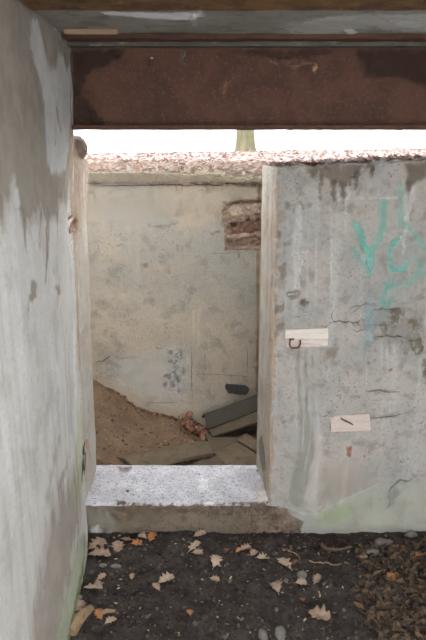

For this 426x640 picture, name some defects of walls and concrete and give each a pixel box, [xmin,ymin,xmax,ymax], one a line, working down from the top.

corrosion [72,51,123,125]
corrosion [358,51,426,86]
water stain [308,163,375,200]
water stain [407,163,426,189]
spalling [222,197,262,250]
crack [325,298,407,343]